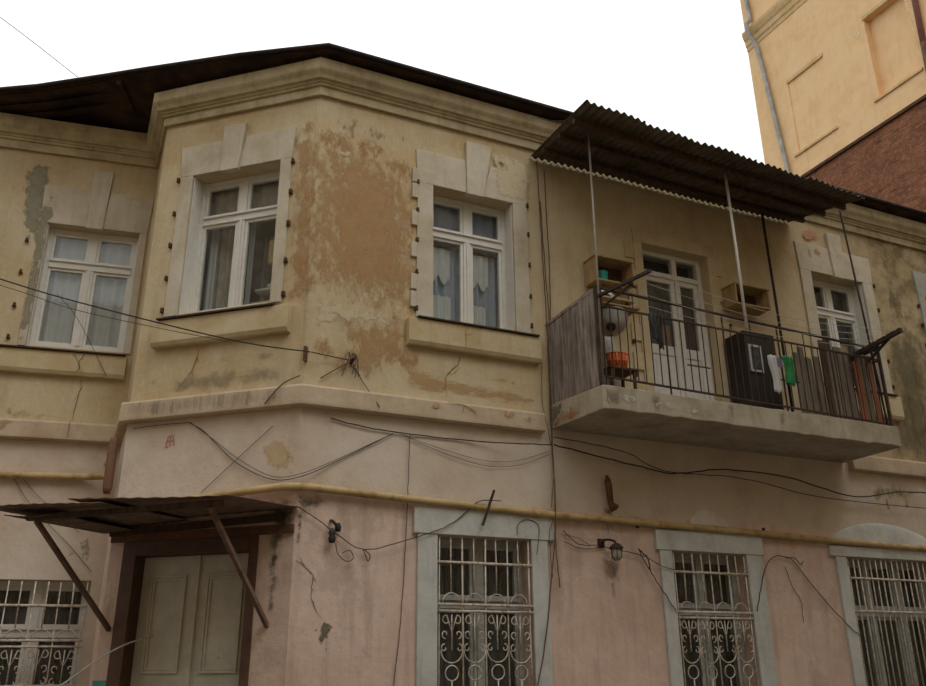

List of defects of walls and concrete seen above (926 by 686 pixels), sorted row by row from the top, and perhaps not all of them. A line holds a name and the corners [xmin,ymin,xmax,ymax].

flaking render [20,165,53,339]
peeling [289,123,315,297]
peeling [492,153,530,200]
crack [67,354,85,436]
peeling [340,318,532,402]
crack [443,329,478,416]
flaking render [315,622,332,642]